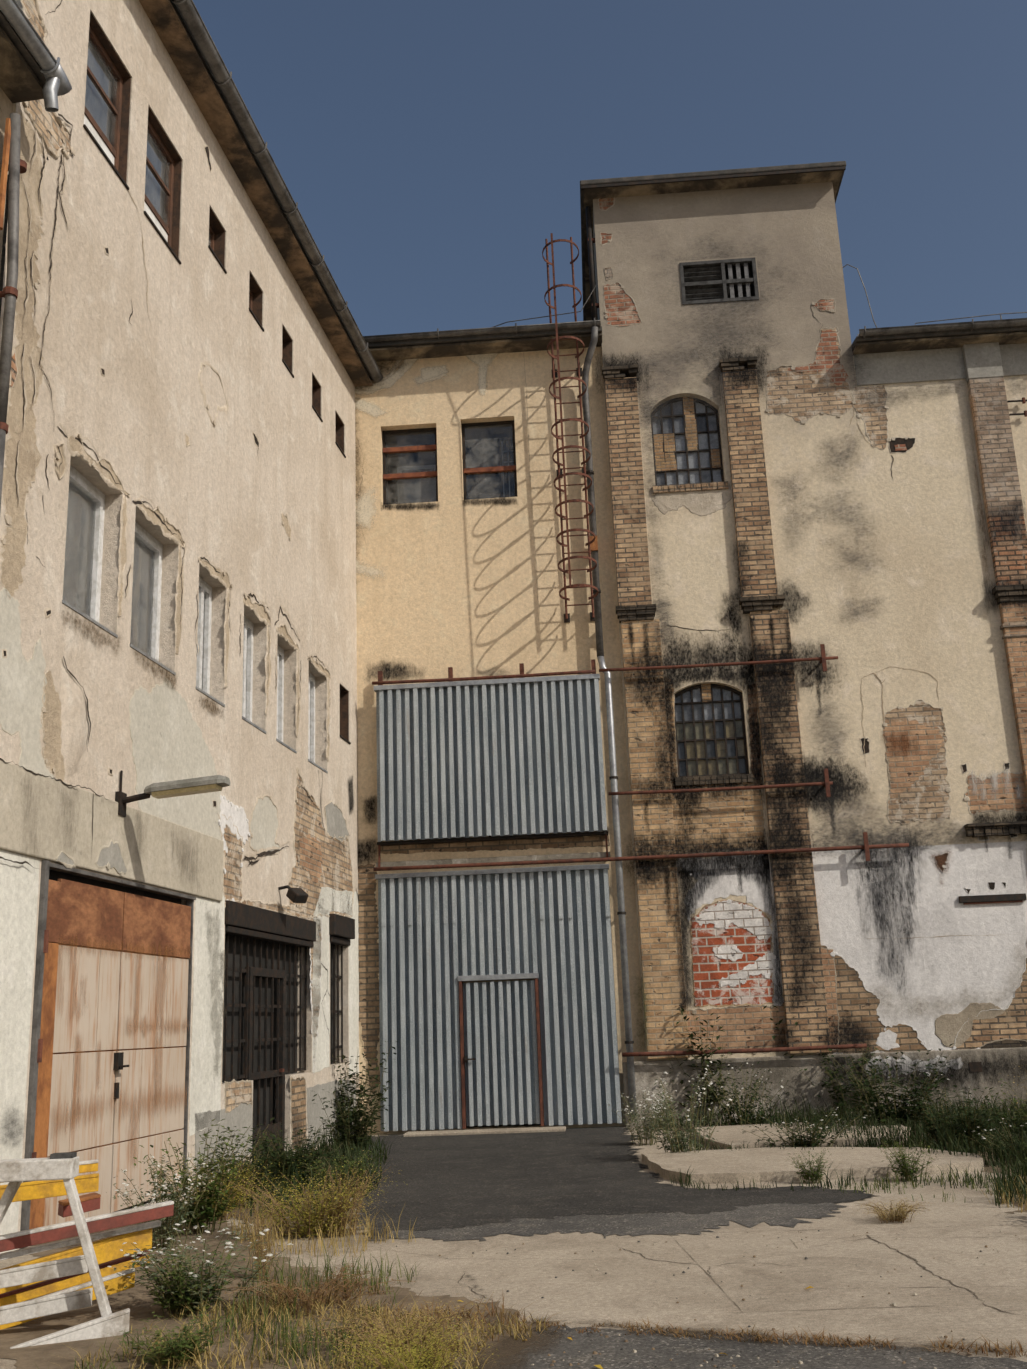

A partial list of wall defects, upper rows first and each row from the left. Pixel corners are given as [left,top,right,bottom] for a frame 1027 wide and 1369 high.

peeling [0,99,331,762]
crack [15,95,331,751]
spalling [765,298,916,453]
spalling [41,670,66,782]
damp [677,792,700,833]
spalling [859,699,1027,825]
spalling [212,766,611,1152]
damp [633,860,693,1003]
damp [766,790,814,1007]
damp [858,832,918,988]
peeling [817,940,1027,1080]
crack [622,1226,1014,1327]